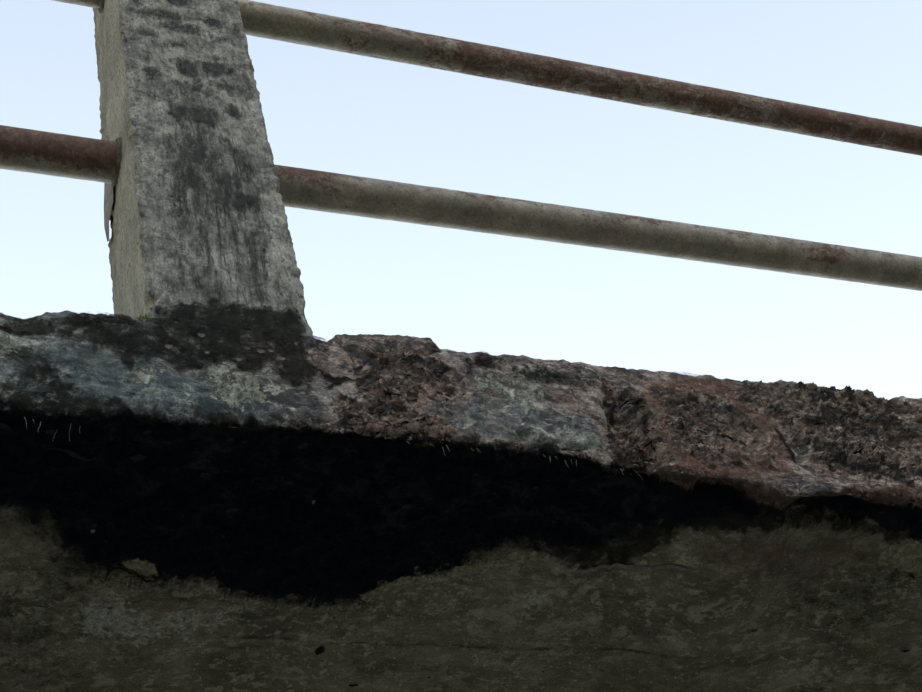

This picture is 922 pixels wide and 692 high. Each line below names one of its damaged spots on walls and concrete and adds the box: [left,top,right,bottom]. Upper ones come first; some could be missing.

water stain [0,398,922,690]